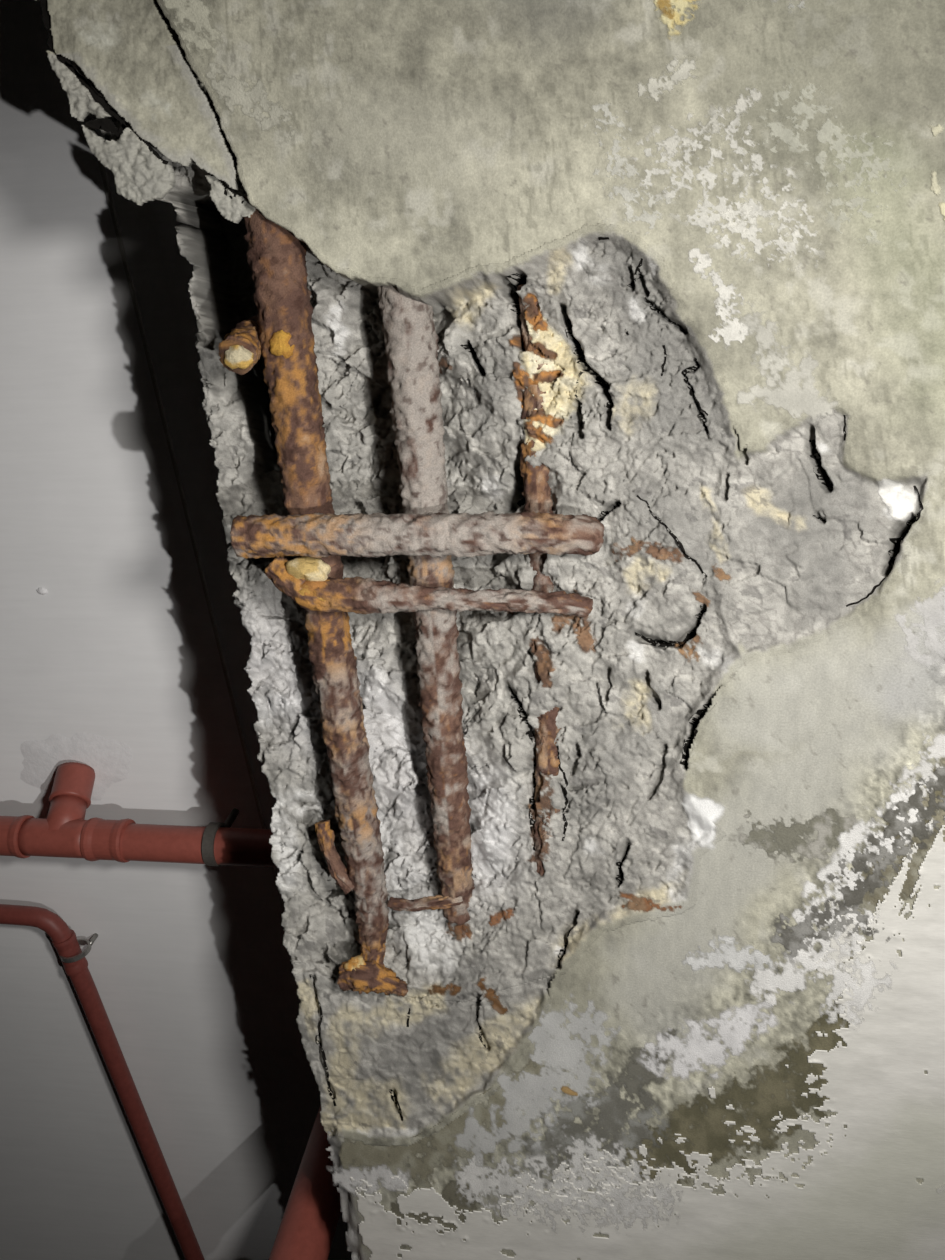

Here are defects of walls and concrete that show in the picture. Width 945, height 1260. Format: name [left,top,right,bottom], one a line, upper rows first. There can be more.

crack [40,0,169,164]
crack [155,0,245,204]
spalling [46,0,746,1147]
rust [510,293,582,451]
rust [530,613,595,688]
crack [600,495,707,648]
crack [809,415,846,488]
spalling [724,397,938,662]
water stain [896,587,945,666]
rust [477,978,508,1014]
water stain [331,734,945,1234]
peeling [350,817,945,1260]